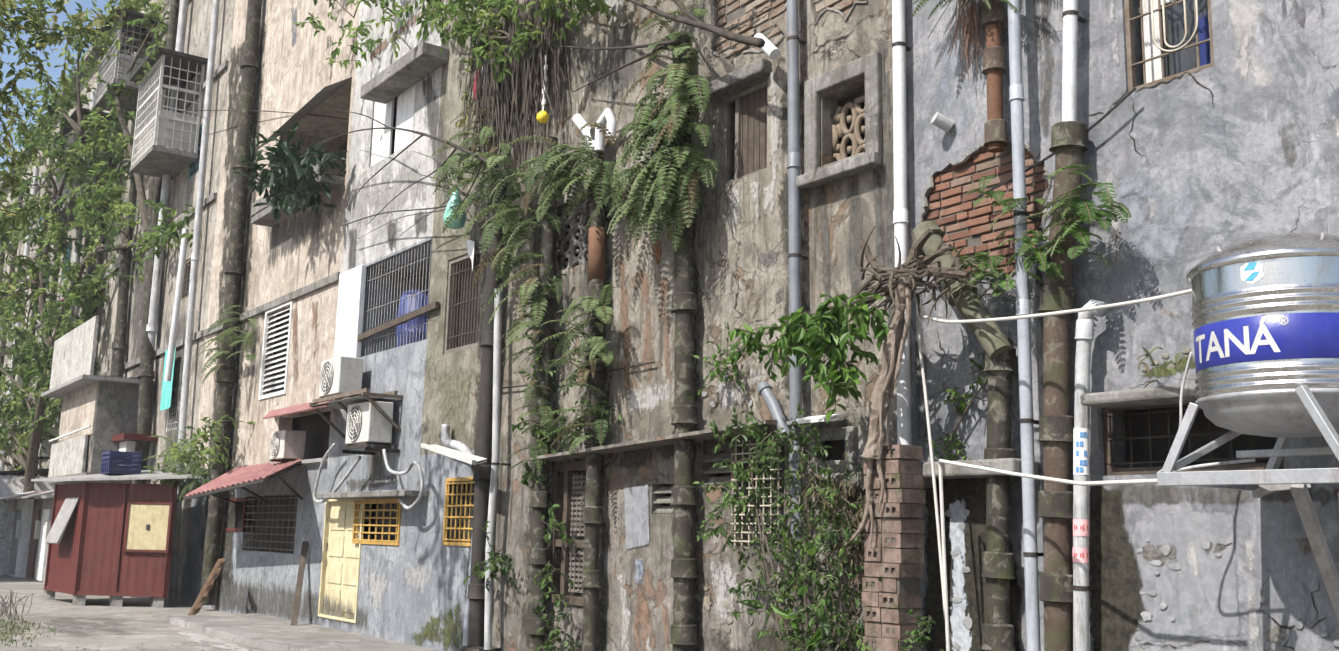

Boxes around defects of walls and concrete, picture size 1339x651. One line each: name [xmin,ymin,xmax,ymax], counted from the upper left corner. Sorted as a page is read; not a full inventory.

flaking render [709,0,787,59]
flaking render [813,0,875,25]
crack [1091,66,1214,163]
flaking render [919,141,1052,278]
leakage [521,176,675,651]
leakage [695,425,778,454]
peeling [944,499,973,651]
crack [1259,577,1326,651]